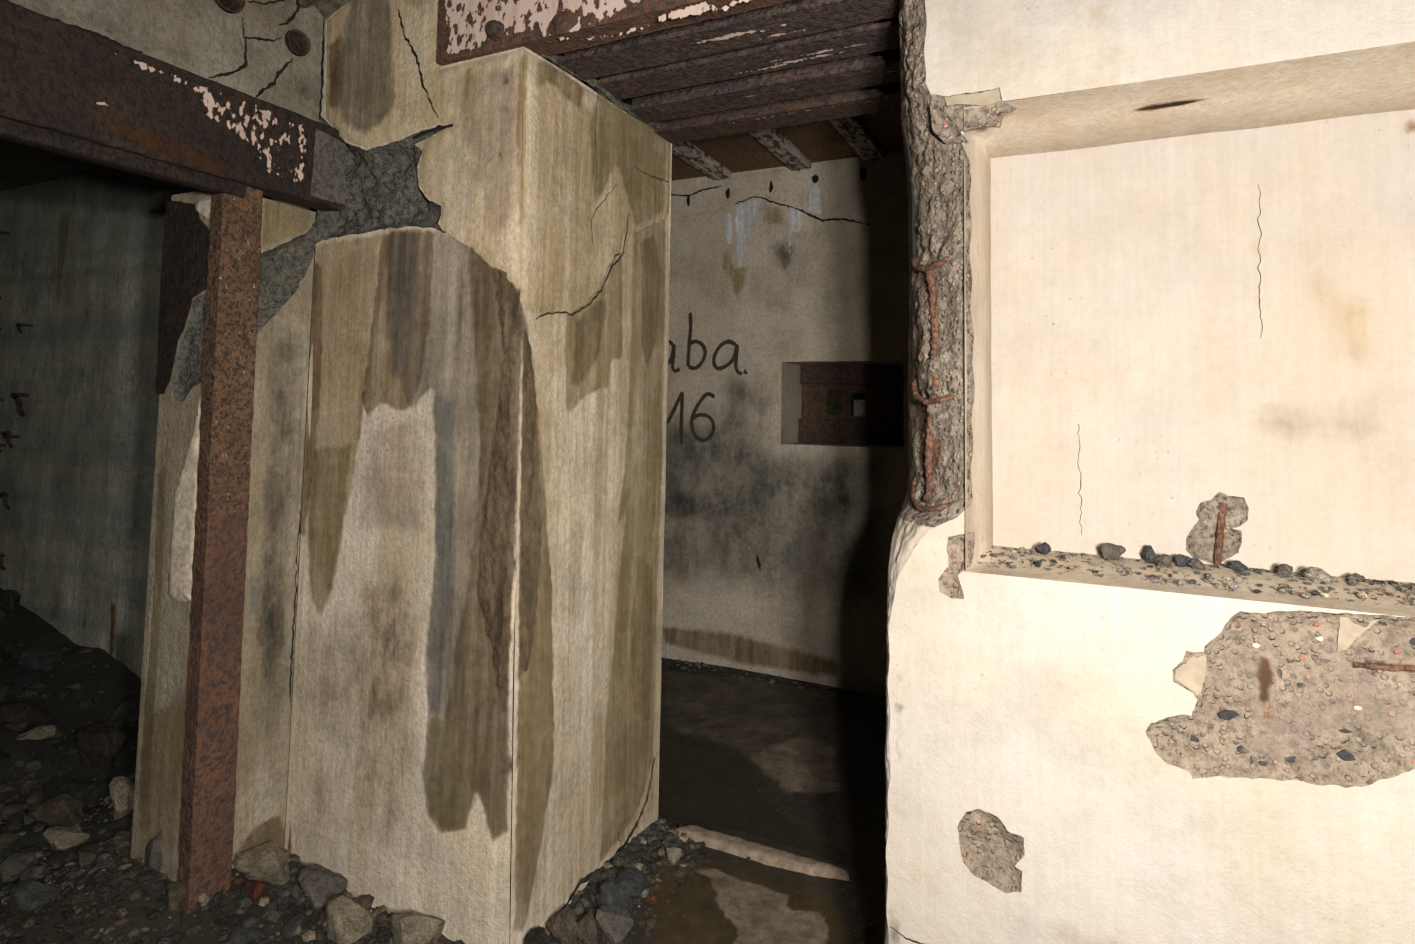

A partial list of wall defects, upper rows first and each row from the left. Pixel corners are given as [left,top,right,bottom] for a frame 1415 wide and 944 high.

crack [54,18,143,54]
crack [209,0,329,120]
peeling [257,0,749,334]
crack [536,90,870,319]
leakage [725,199,758,267]
leakage [780,184,821,263]
spalling [868,0,1018,844]
spalling [1186,492,1249,568]
leakage [523,635,553,797]
spalling [1146,610,1415,788]
spalling [957,809,1025,894]
crack [890,927,924,944]